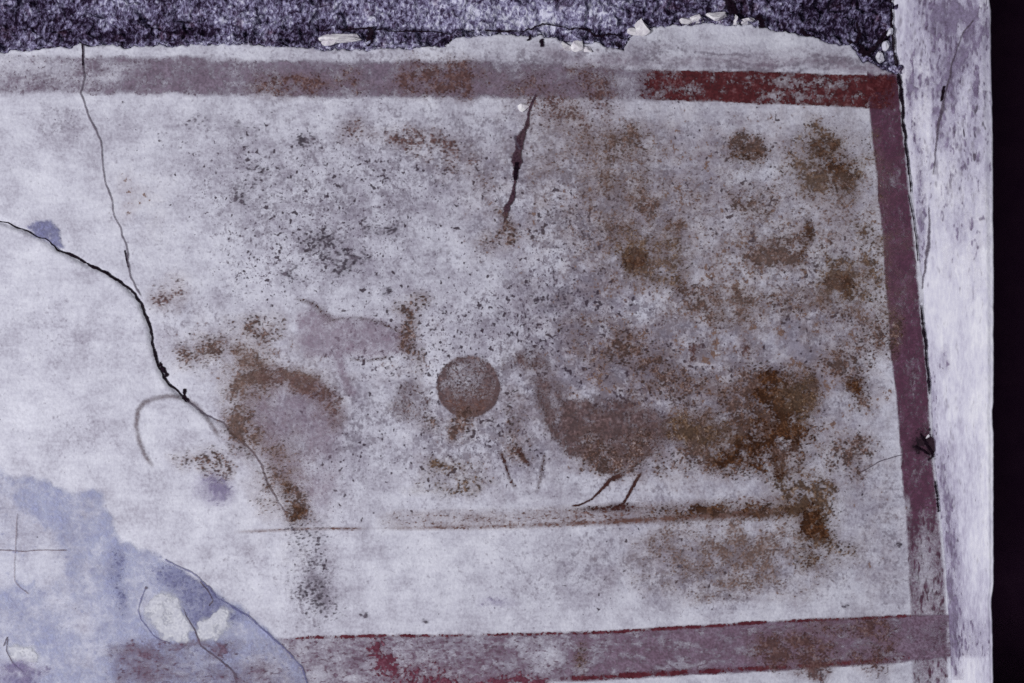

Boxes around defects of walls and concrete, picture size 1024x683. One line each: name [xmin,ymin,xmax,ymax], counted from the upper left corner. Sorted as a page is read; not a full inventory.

spalling [0,0,904,74]
crack [0,44,287,518]
leakage [533,107,896,332]
leakage [631,505,835,604]